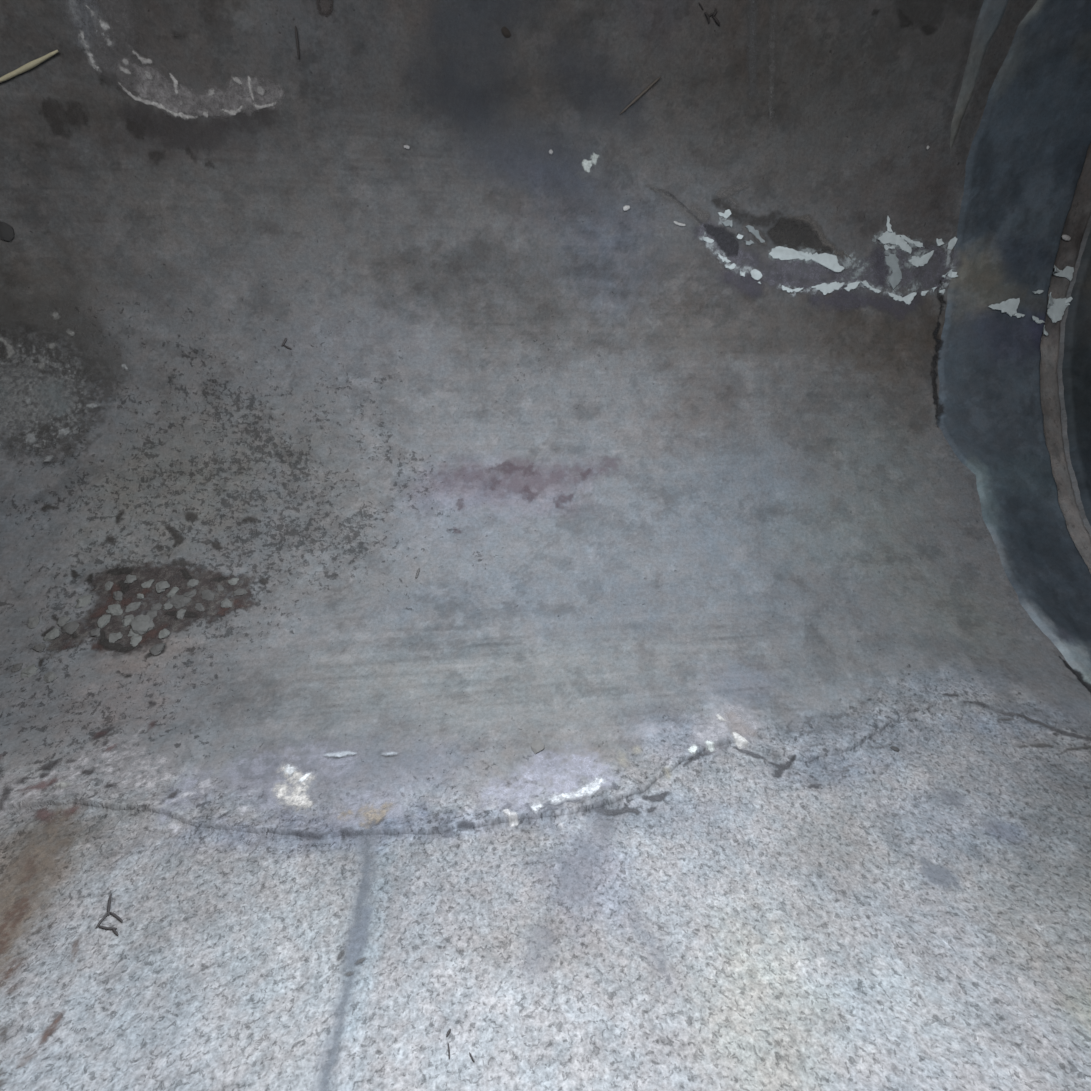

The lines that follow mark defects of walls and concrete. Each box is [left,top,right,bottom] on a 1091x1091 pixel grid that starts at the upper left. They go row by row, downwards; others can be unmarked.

leakage [68,0,283,152]
peeling [674,181,960,314]
crack [930,280,946,423]
peeling [988,290,1073,336]
peeling [1052,265,1074,281]